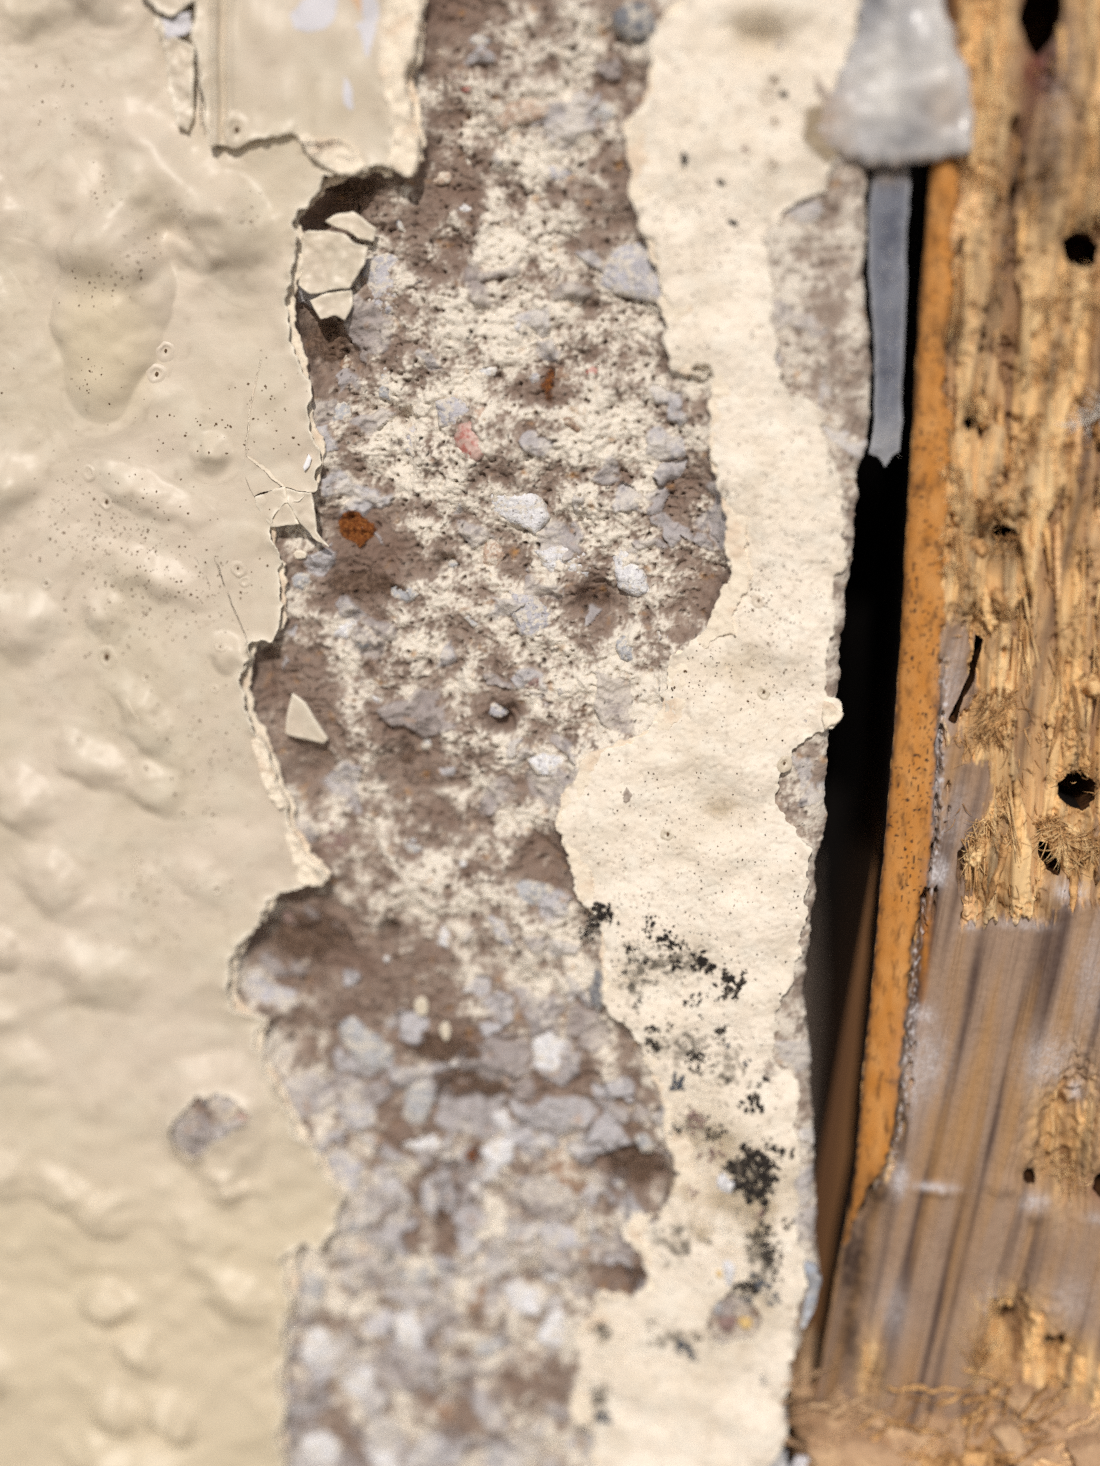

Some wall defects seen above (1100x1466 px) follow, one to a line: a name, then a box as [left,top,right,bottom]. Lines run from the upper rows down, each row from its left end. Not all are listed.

crack [246,360,310,498]
spalling [146,0,732,1466]
water stain [579,901,798,1368]
mould [577,1377,623,1442]